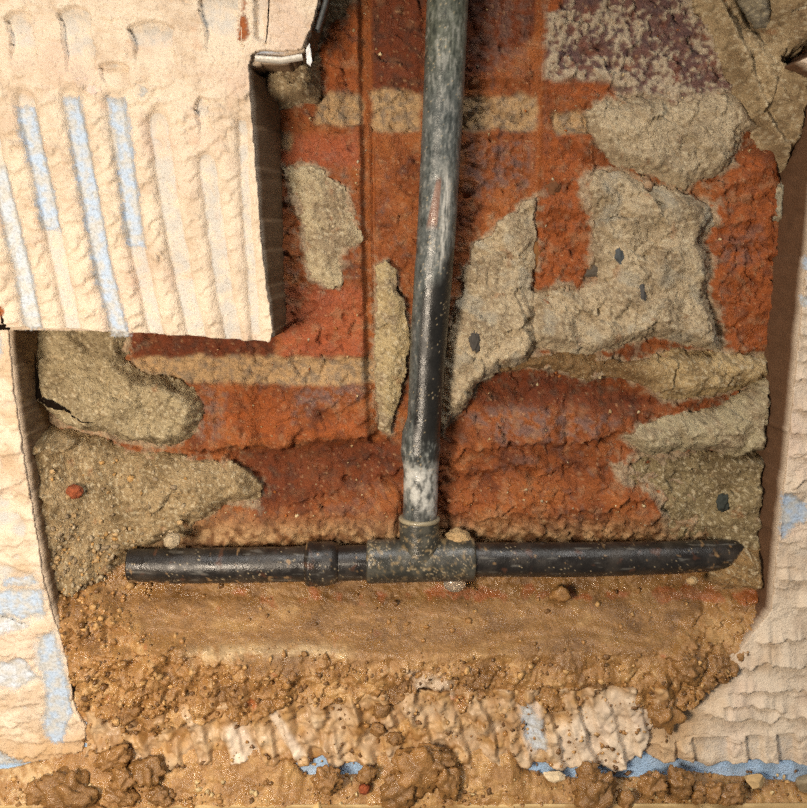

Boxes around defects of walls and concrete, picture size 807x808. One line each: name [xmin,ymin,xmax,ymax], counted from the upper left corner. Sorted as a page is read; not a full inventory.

crack [263,0,271,44]
spalling [263,0,349,110]
spalling [282,166,363,290]
spalling [0,77,264,597]
spalling [374,260,411,434]
spalling [441,0,807,590]
peeling [0,634,73,743]
peeling [520,704,547,750]
spalling [744,774,765,789]